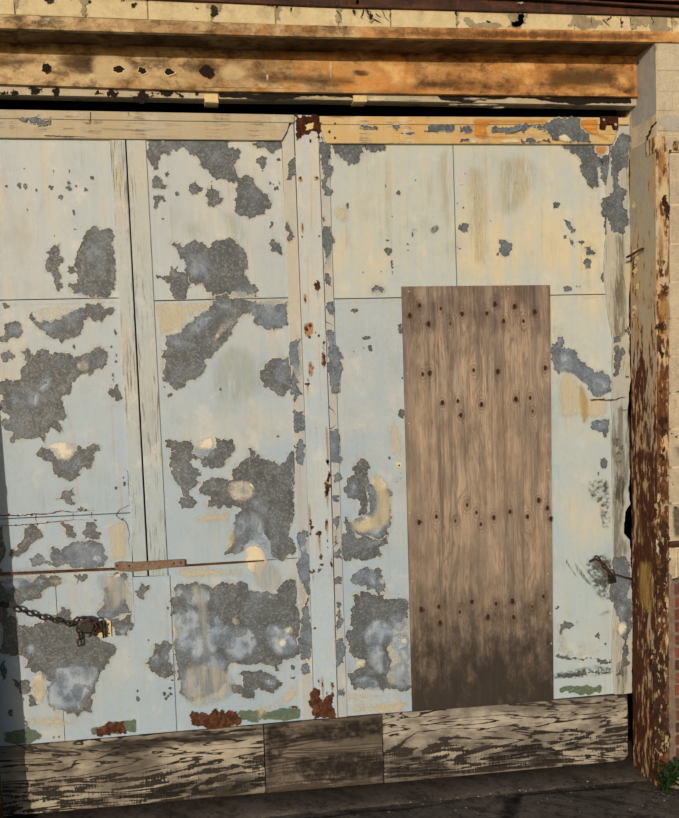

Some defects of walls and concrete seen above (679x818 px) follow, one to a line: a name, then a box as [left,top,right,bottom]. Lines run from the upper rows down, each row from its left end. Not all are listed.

peeling [491,116,636,235]
peeling [0,226,118,512]
peeling [156,237,289,398]
peeling [551,326,631,397]
corrosion [655,195,670,334]
peeling [141,338,312,702]
corrosion [650,416,679,616]
peeling [0,520,134,718]
corrosion [95,721,126,737]
corrosion [189,709,242,729]
corrosion [308,680,336,719]
corrosion [649,630,671,758]